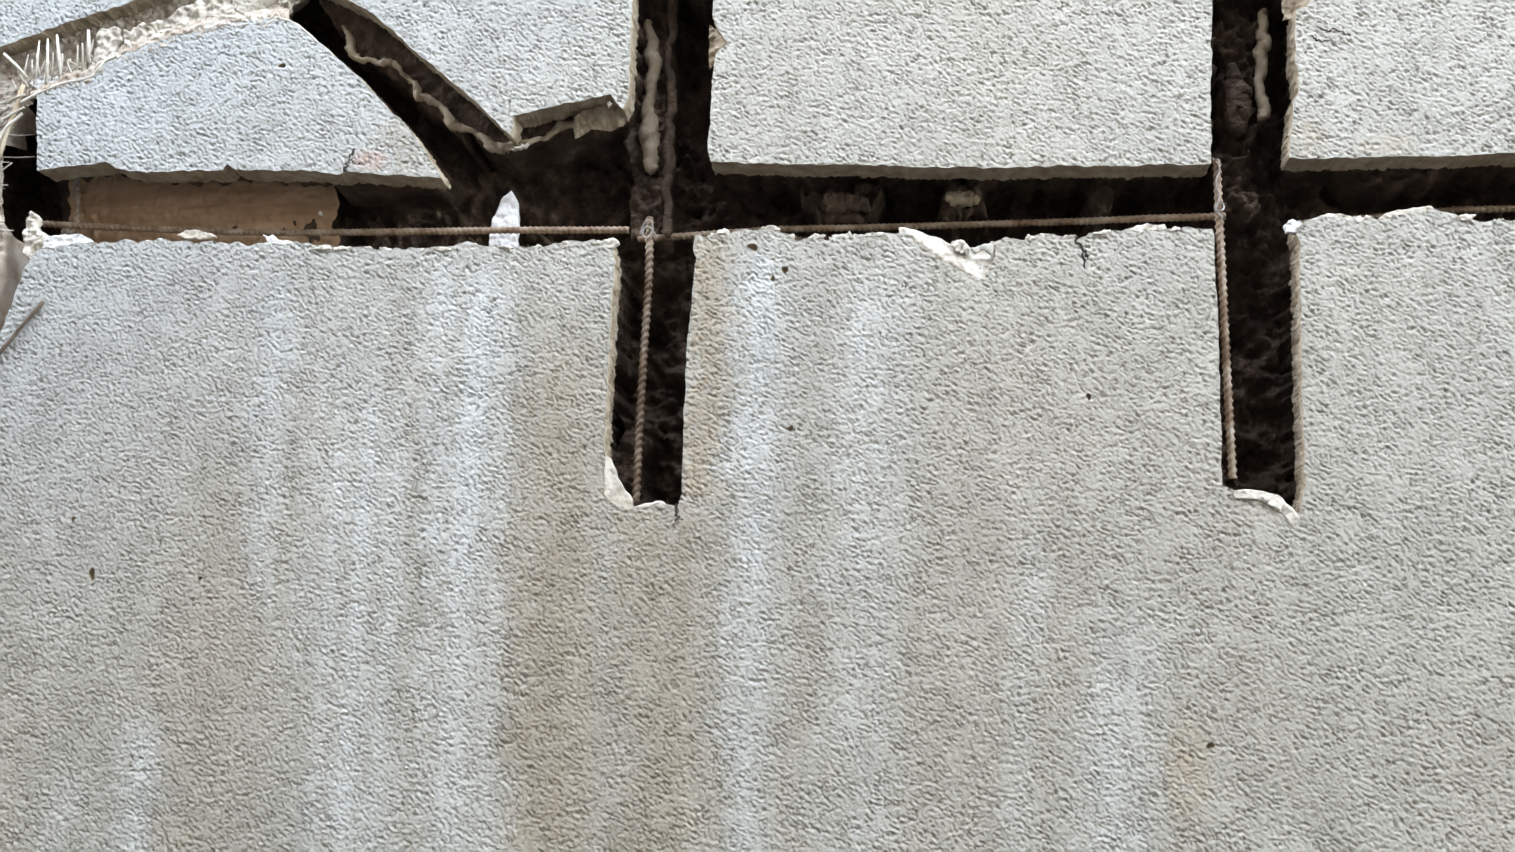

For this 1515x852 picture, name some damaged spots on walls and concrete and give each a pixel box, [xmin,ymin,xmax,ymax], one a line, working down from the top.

spalling [1282,0,1325,21]
spalling [1348,212,1386,224]
spalling [1409,205,1515,221]
spalling [0,0,1300,527]
corrosion [682,231,745,507]